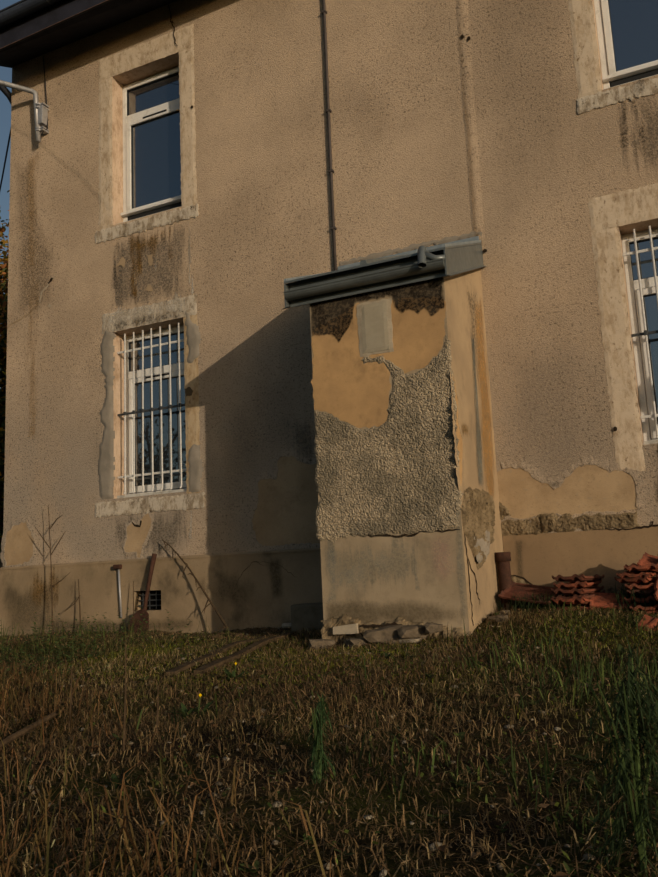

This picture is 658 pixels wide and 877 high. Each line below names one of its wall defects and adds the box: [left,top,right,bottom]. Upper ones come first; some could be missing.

water stain [106,230,194,329]
peeling [311,300,446,428]
peeling [0,515,38,567]
peeling [122,512,155,559]
peeling [245,448,320,551]
peeling [450,364,648,570]